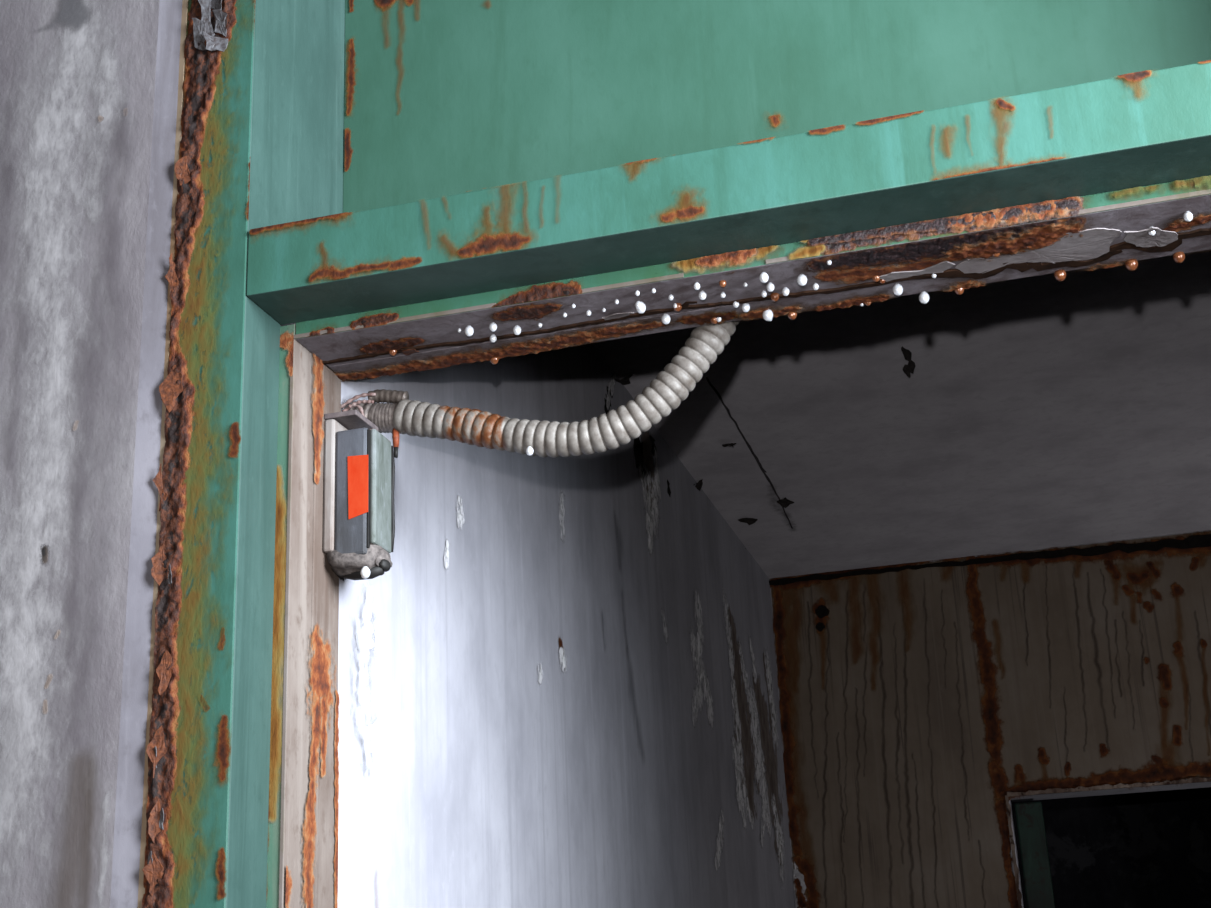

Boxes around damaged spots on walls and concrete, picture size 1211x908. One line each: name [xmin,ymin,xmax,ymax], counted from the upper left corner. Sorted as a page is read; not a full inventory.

corrosion [142,0,256,908]
corrosion [344,39,356,172]
corrosion [309,193,1087,484]
crack [706,377,793,529]
peeling [879,227,1178,282]
corrosion [1164,213,1211,232]
corrosion [268,465,287,844]
corrosion [285,625,340,908]
peeling [355,587,379,771]
peeling [689,589,714,729]
peeling [722,587,808,908]
corrosion [769,532,1211,908]